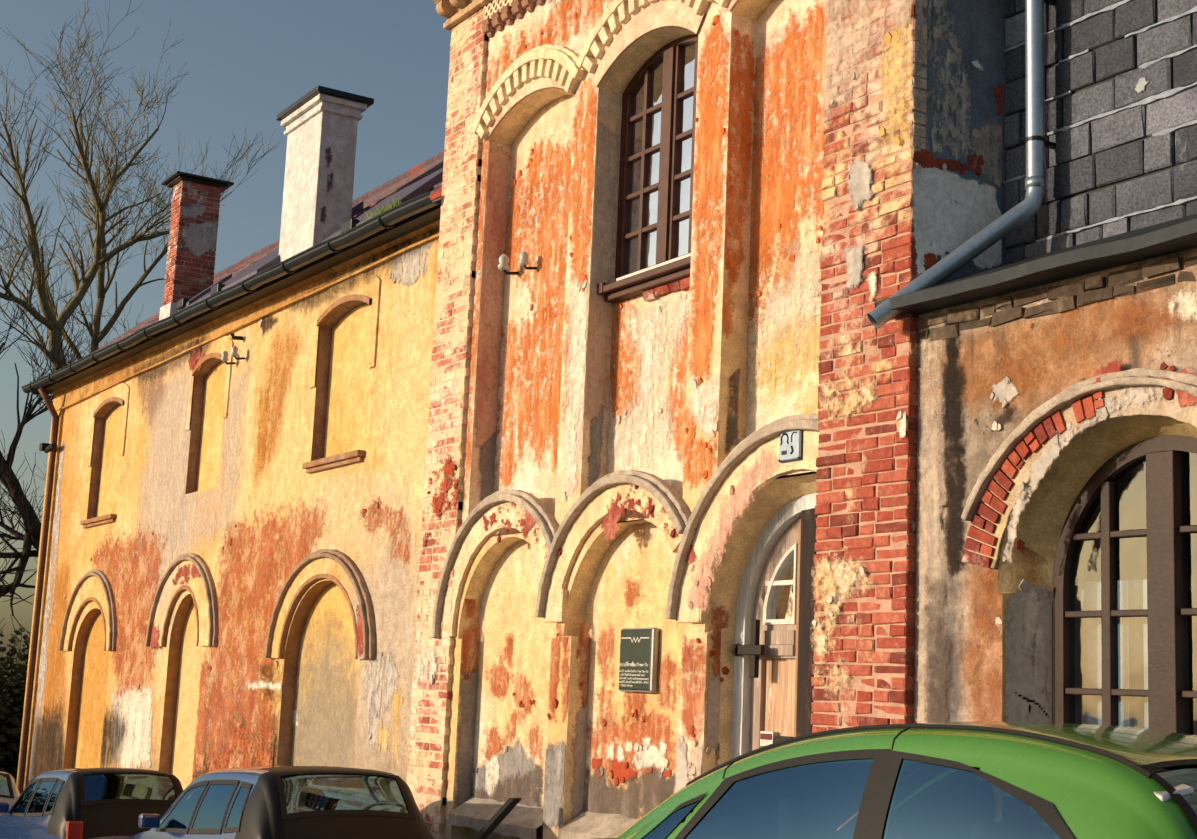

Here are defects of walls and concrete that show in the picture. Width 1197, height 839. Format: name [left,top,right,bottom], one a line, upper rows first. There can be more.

flaking render [180,204,218,257]
flaking render [844,243,863,288]
flaking render [847,160,873,211]
flaking render [879,18,1002,274]
peeling [90,371,324,781]
flaking render [356,592,406,766]
peeling [454,452,778,819]
water stain [920,316,967,723]
flaking render [990,376,1018,431]
flaking render [1003,362,1197,562]
flaking render [1092,359,1123,378]